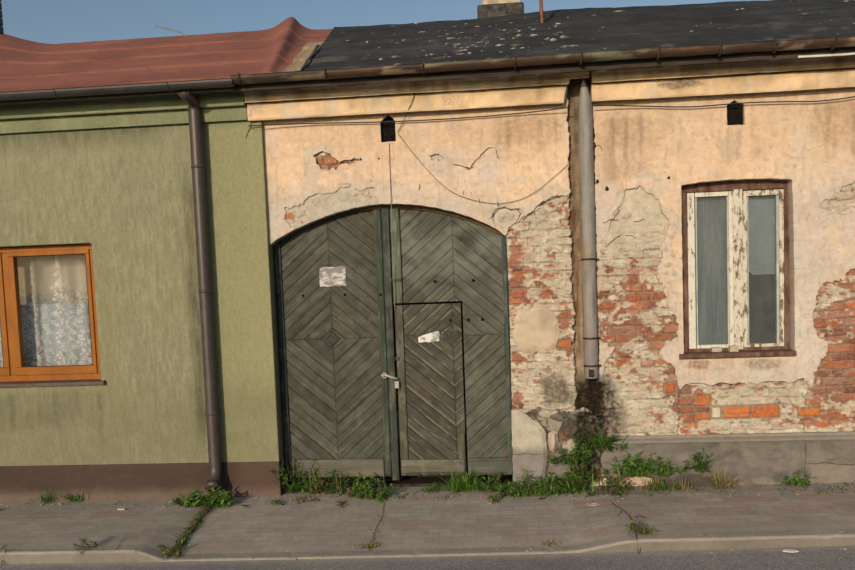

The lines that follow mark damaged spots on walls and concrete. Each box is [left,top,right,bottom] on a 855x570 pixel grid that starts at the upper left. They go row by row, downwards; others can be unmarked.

flaking render [314,151,362,170]
crack [453,147,499,170]
peeling [285,184,383,231]
crack [454,188,559,222]
flaking render [505,181,855,486]
leakage [543,375,621,478]